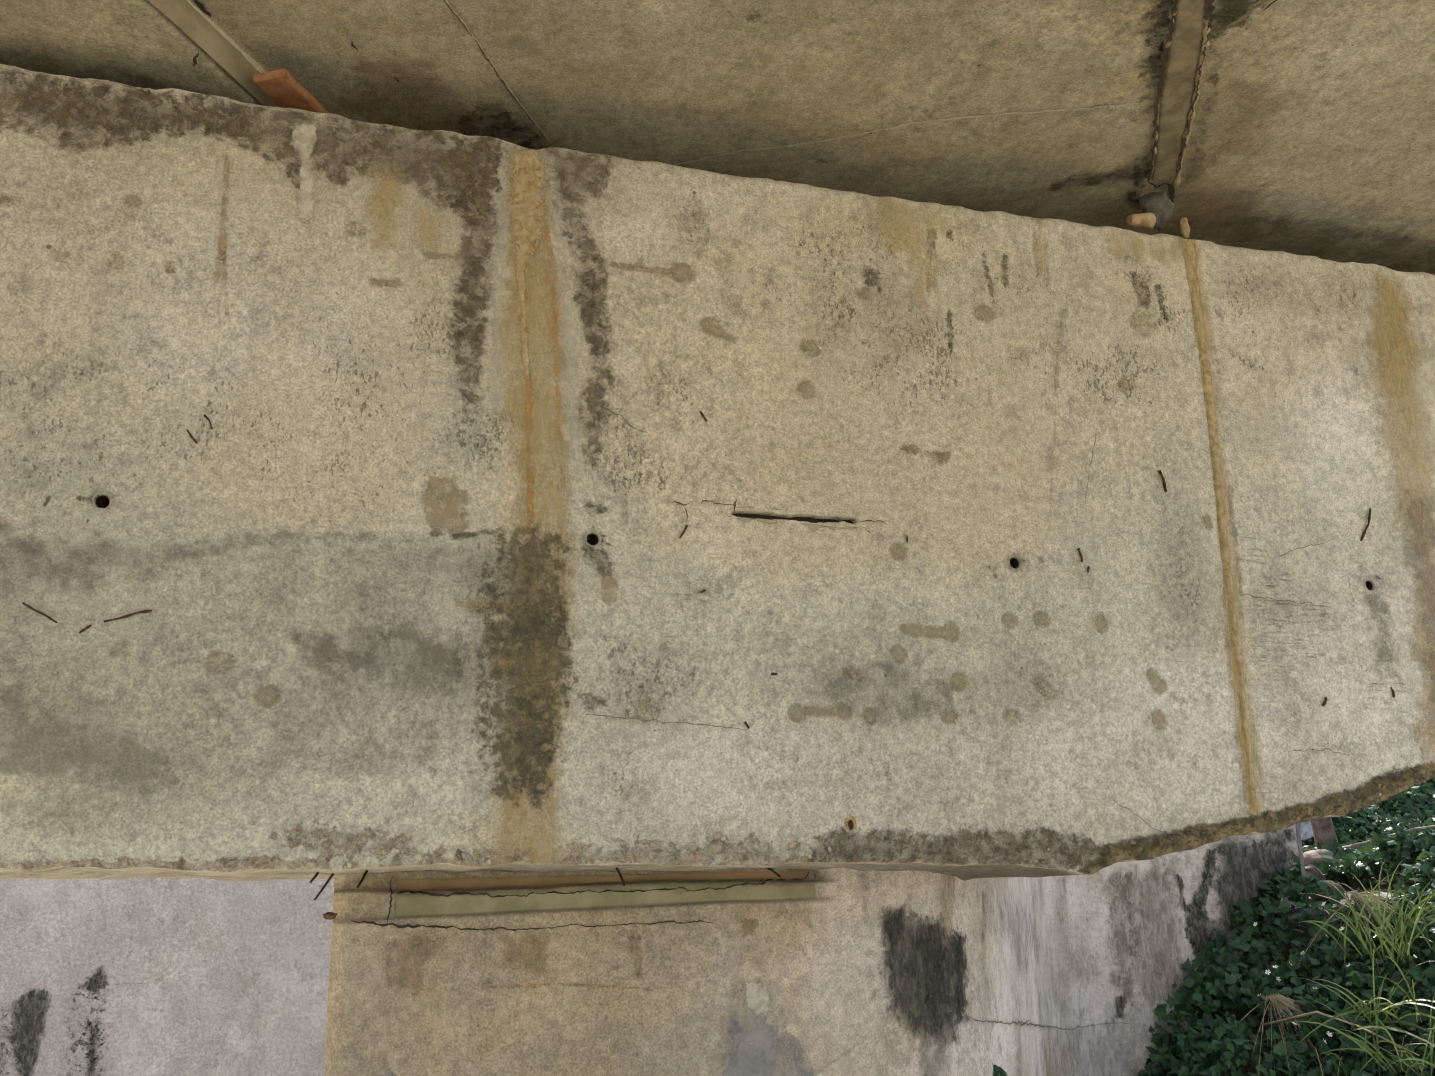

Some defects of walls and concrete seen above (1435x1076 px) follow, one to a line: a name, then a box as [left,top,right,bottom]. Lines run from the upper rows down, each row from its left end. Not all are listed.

water stain [1137,0,1175,114]
water stain [1185,0,1264,184]
water stain [1049,157,1150,203]
water stain [0,55,672,490]
rust [479,188,568,865]
crack [667,499,888,534]
water stain [315,477,695,809]
crack [351,872,810,931]
water stain [880,907,968,1076]